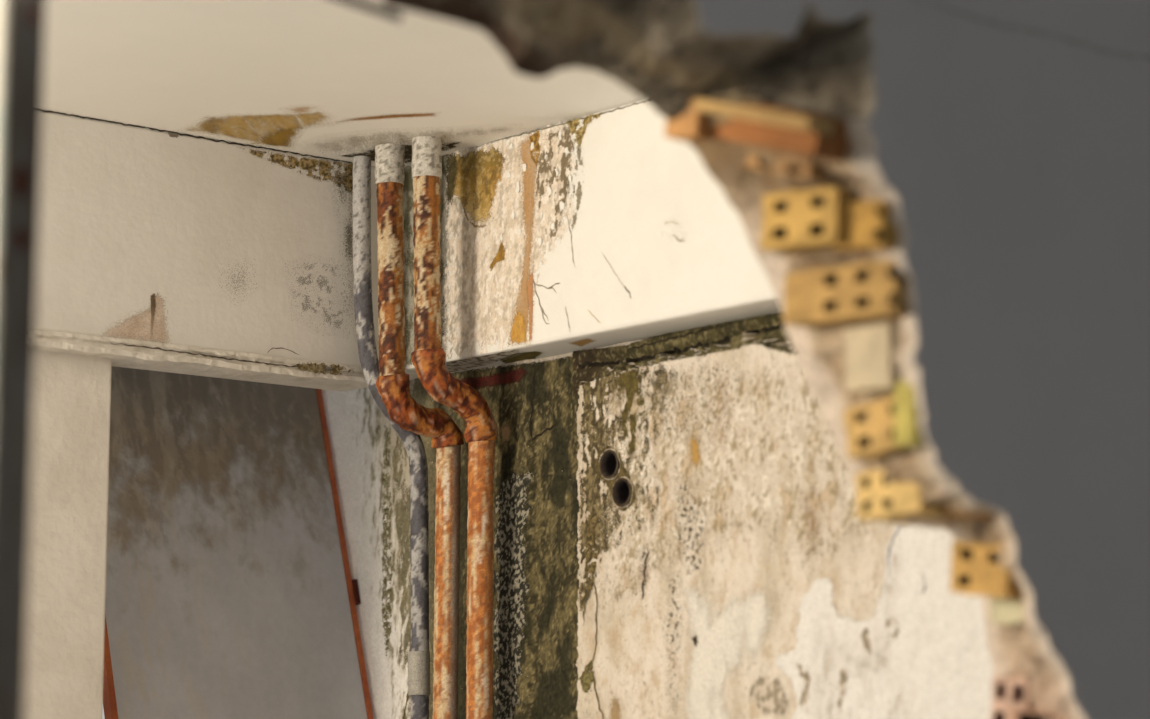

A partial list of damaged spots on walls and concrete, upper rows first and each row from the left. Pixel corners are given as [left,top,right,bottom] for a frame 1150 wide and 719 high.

water stain [182,106,520,367]
corrosion [510,130,541,345]
corrosion [460,367,526,389]
water stain [501,351,542,363]
spalling [384,0,1086,719]